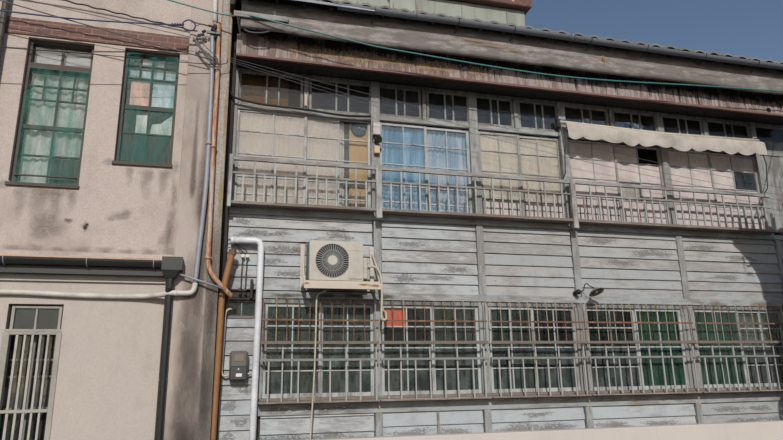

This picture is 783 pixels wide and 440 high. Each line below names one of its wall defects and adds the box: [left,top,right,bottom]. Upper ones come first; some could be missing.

damp [266,33,783,109]
damp [174,146,219,440]
rust [298,298,783,341]